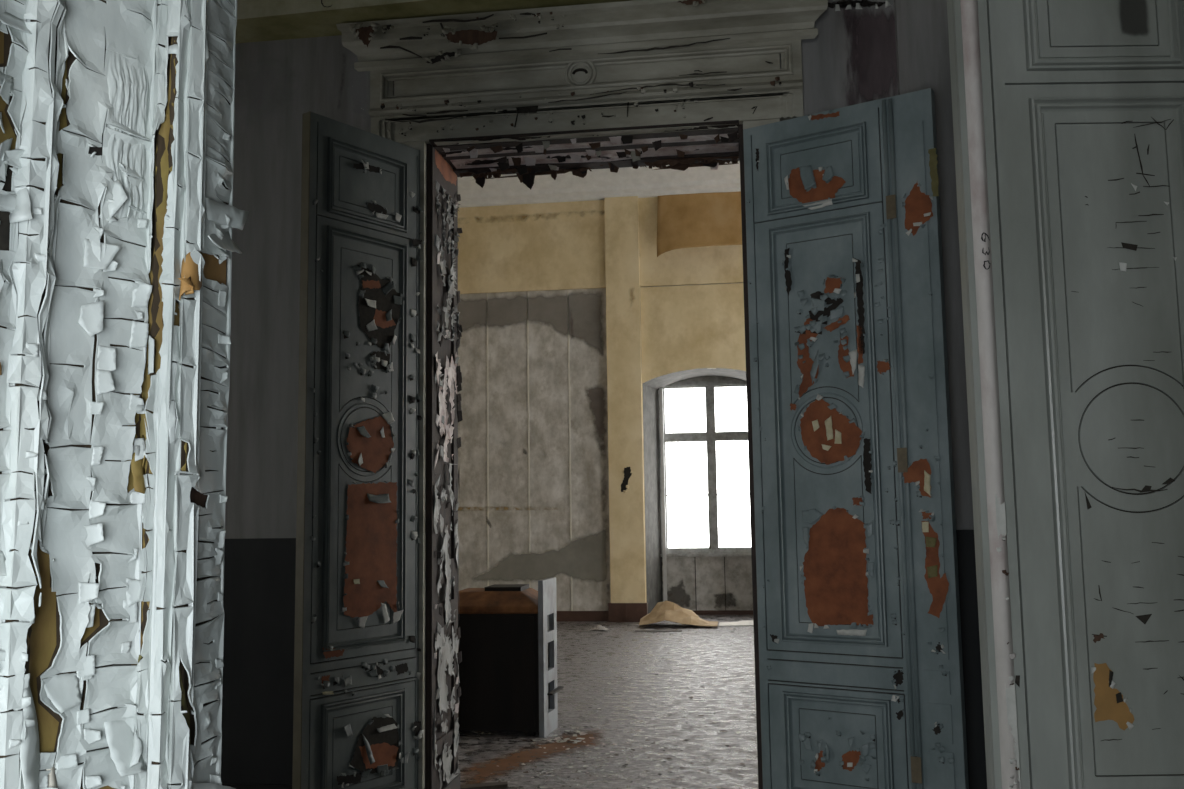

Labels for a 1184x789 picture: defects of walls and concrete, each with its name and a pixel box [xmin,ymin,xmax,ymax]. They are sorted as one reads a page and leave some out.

peeling [0,12,42,273]
peeling [54,153,64,200]
peeling [59,59,69,131]
peeling [902,148,939,236]
peeling [78,40,249,566]
peeling [337,81,739,789]
peeling [782,248,891,636]
peeling [901,459,949,618]
peeling [9,521,150,789]
peeling [178,664,194,745]
peeling [192,757,236,789]
peeling [1091,663,1135,731]